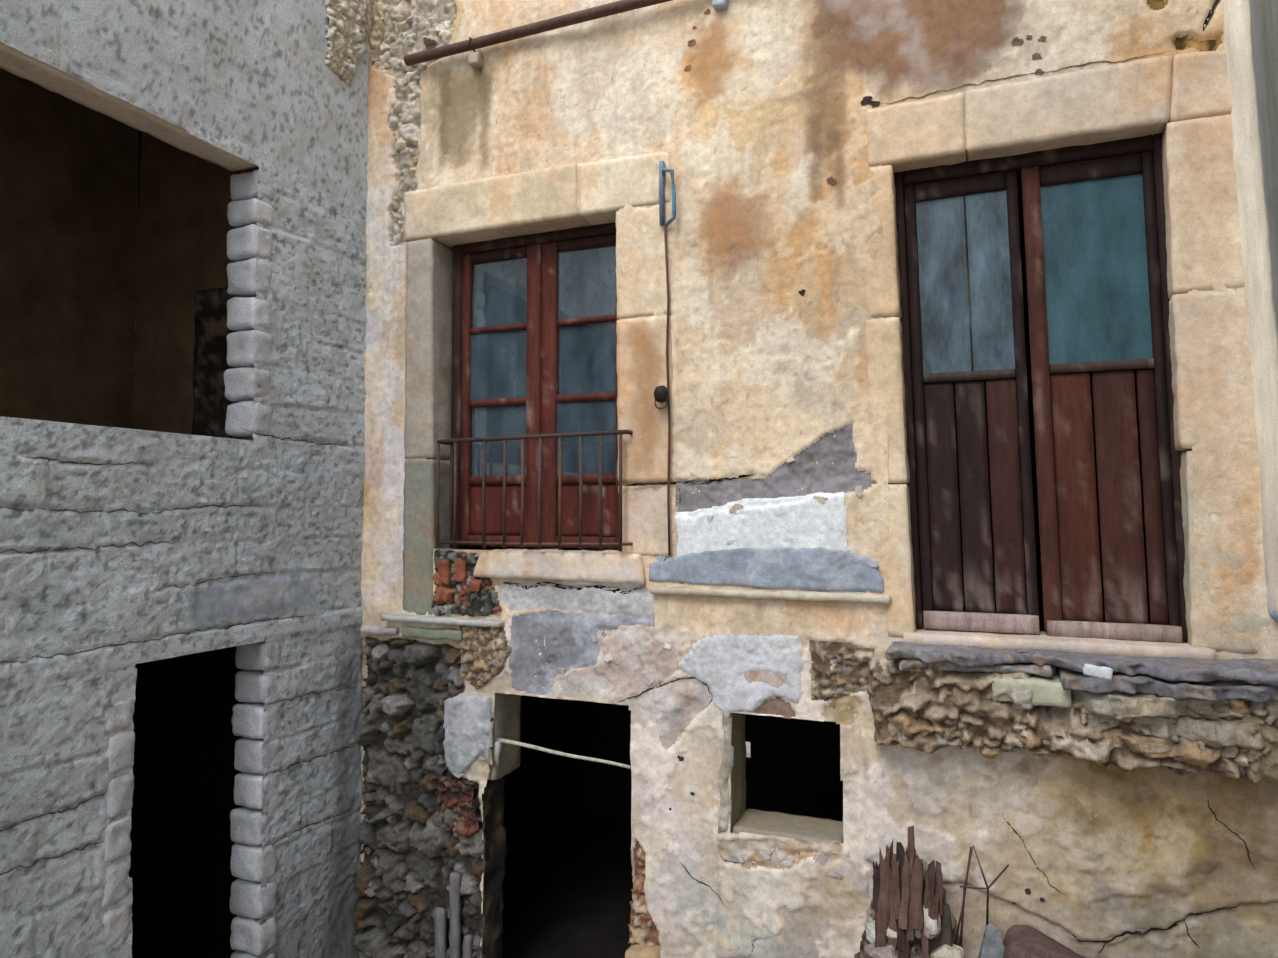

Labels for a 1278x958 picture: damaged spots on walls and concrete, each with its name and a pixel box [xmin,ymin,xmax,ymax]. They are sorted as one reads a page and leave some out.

spalling [1174,0,1222,52]
spalling [325,0,457,246]
leakage [809,0,1019,184]
crack [873,50,1175,107]
peeling [657,424,876,562]
peeling [437,560,680,700]
spalling [809,640,875,725]
peeling [1083,664,1113,681]
spalling [717,710,843,879]
crack [1002,815,1066,896]
crack [1208,800,1255,868]
crack [1063,906,1237,953]